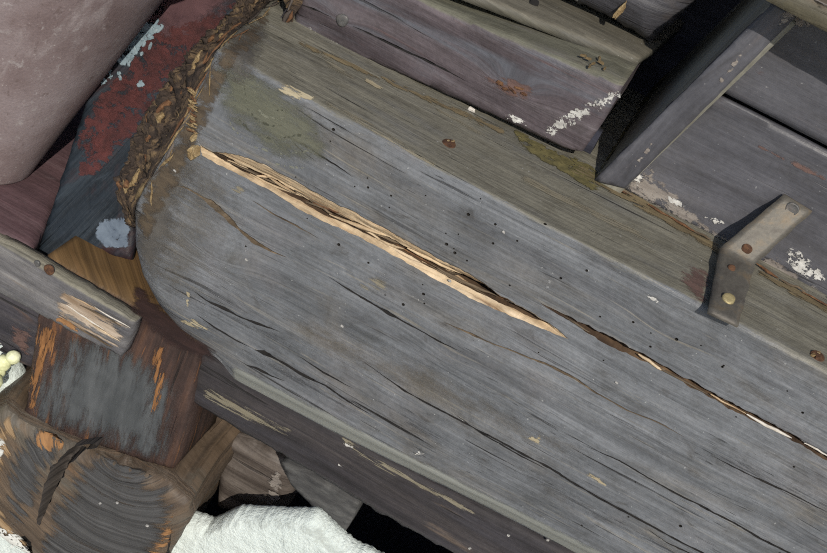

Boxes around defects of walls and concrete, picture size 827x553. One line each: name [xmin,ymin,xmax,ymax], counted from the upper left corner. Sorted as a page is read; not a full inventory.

crack [176,185,285,257]
crack [194,144,827,460]
crack [17,437,104,553]